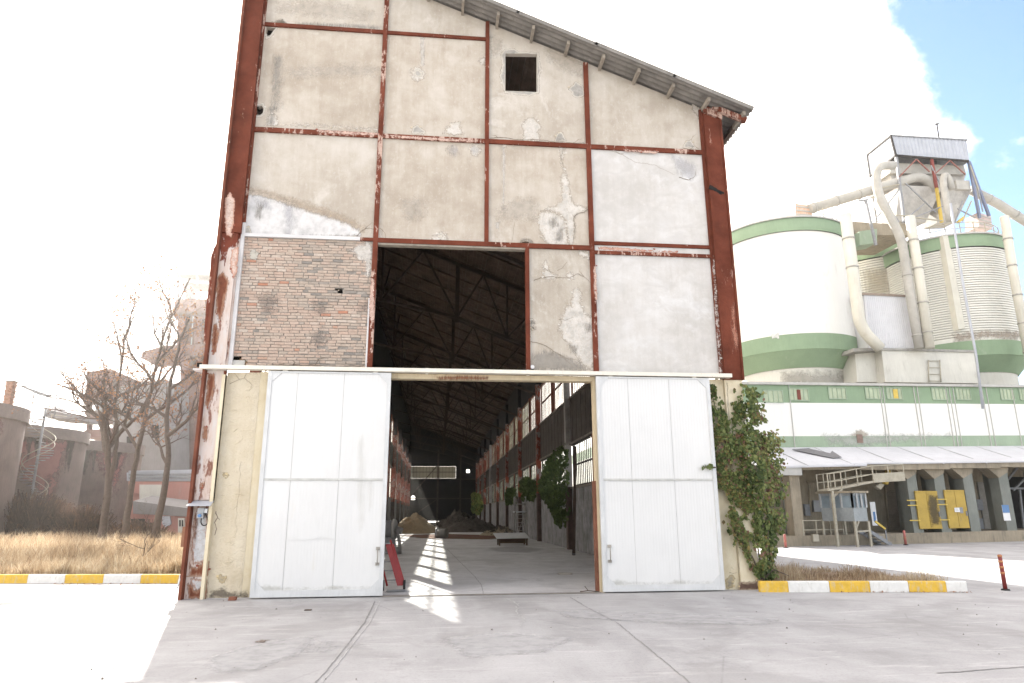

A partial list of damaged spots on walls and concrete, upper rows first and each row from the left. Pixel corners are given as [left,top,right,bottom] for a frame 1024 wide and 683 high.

peeling [224,192,252,279]
peeling [522,132,678,370]
corrosion [211,271,229,355]
corrosion [204,373,216,410]
corrosion [187,561,211,599]